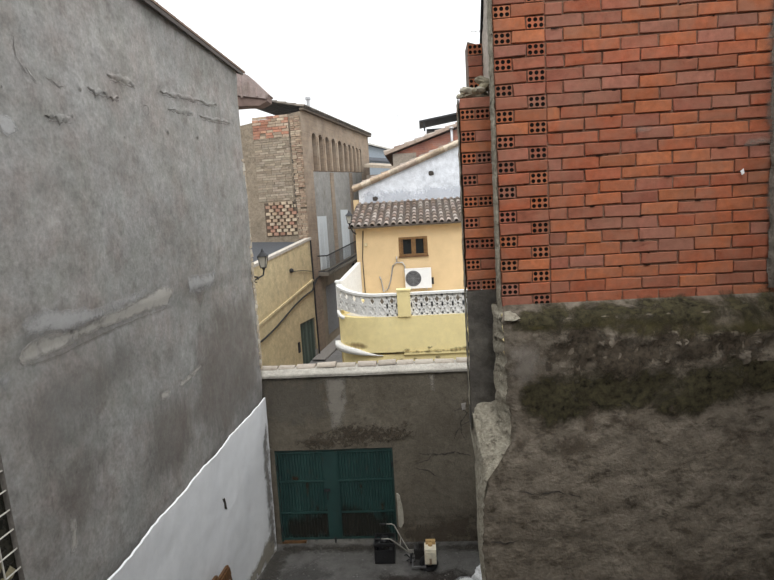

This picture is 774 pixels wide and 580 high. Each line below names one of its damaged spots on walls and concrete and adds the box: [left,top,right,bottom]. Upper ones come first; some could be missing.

crack [13,37,63,87]
peeling [19,287,172,370]
damp [513,291,774,330]
spalling [491,301,513,447]
damp [520,356,774,430]
spalling [297,423,413,450]
crack [416,403,469,476]
spalling [475,461,489,580]